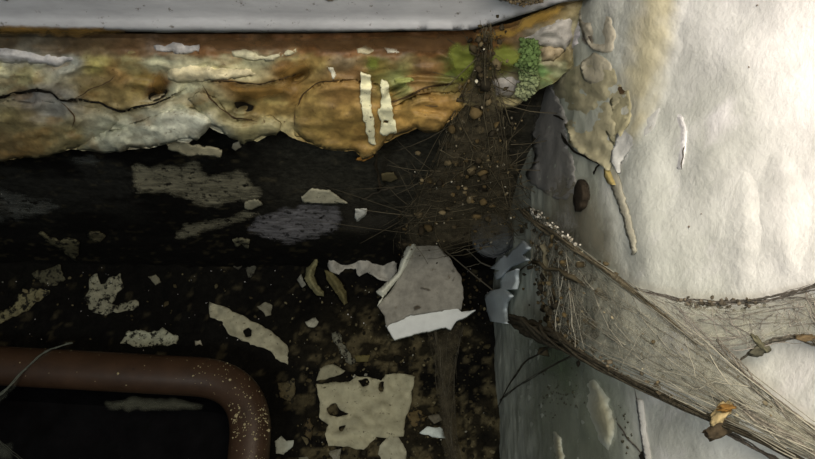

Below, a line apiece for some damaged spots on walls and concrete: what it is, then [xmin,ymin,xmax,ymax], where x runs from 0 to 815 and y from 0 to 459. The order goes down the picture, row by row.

crack [0,78,177,127]
crack [202,72,342,126]
peeling [0,0,637,255]
peeling [278,380,296,401]
peeling [304,331,444,459]
peeling [275,436,294,455]